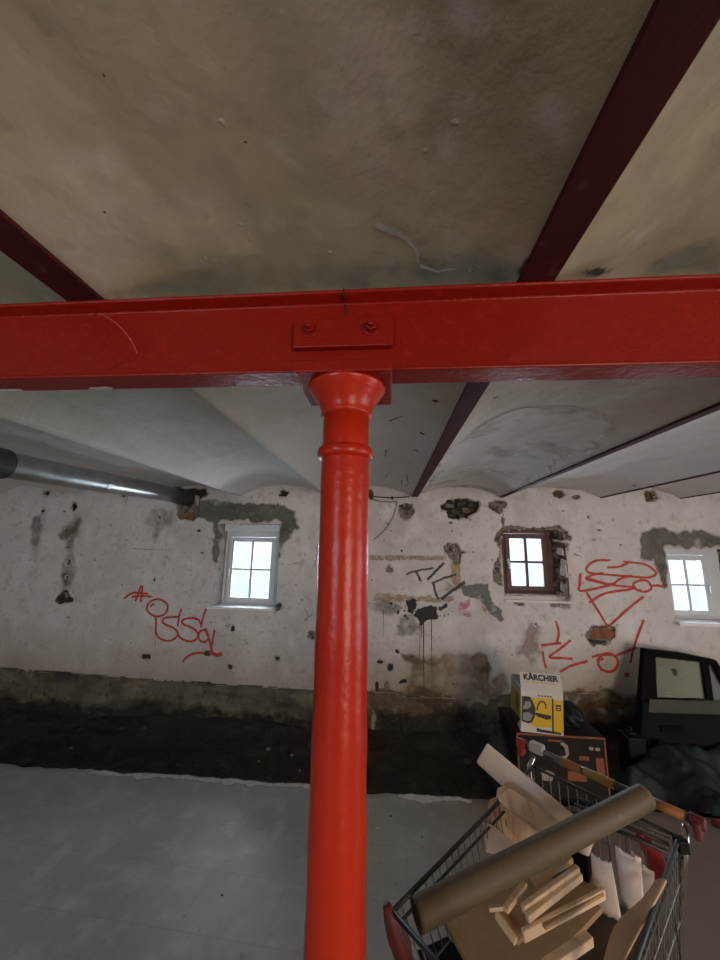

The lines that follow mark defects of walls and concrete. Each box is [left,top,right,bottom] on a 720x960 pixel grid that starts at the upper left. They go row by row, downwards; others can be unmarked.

spalling [176,486,212,532]
spalling [371,498,479,585]
spalling [492,525,571,609]
spalling [581,624,619,647]
damp [394,653,498,713]